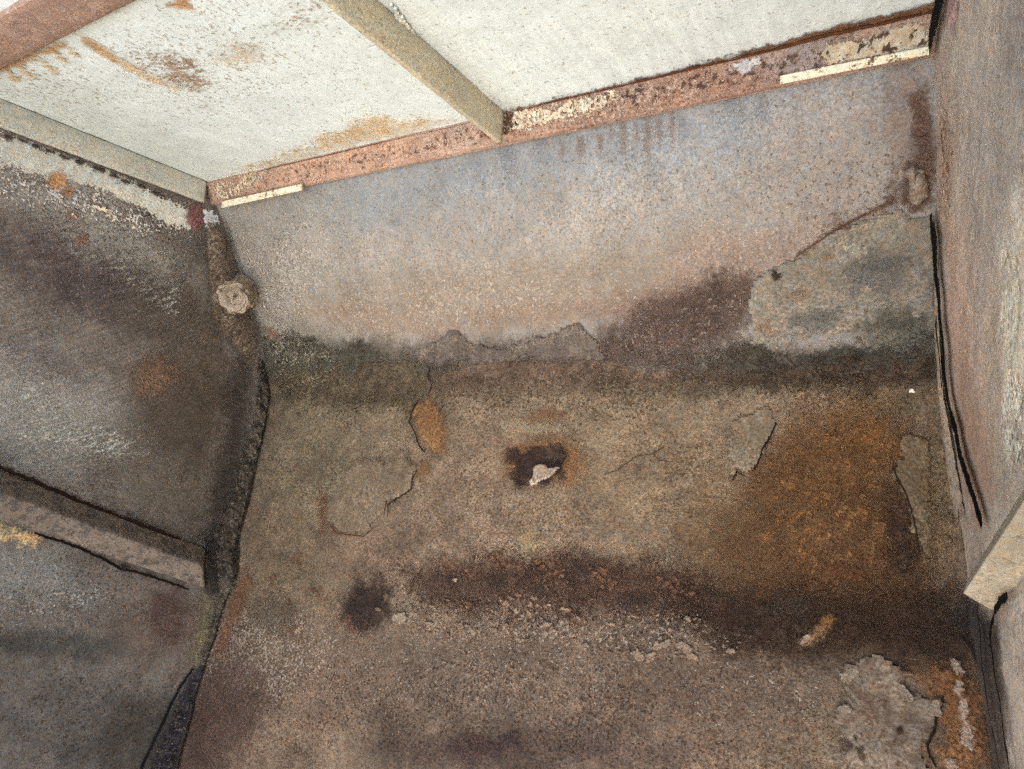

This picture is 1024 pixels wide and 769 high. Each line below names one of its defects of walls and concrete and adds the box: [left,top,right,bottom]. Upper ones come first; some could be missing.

corrosion [0,37,259,103]
corrosion [499,2,935,135]
corrosion [858,77,951,231]
peeling [748,203,935,352]
damp [268,335,335,396]
crack [930,213,983,528]
peeling [720,407,778,480]
peeling [891,435,937,579]
damp [340,579,408,633]
corrosion [399,398,989,769]
damp [801,616,833,646]
peeling [826,654,947,769]